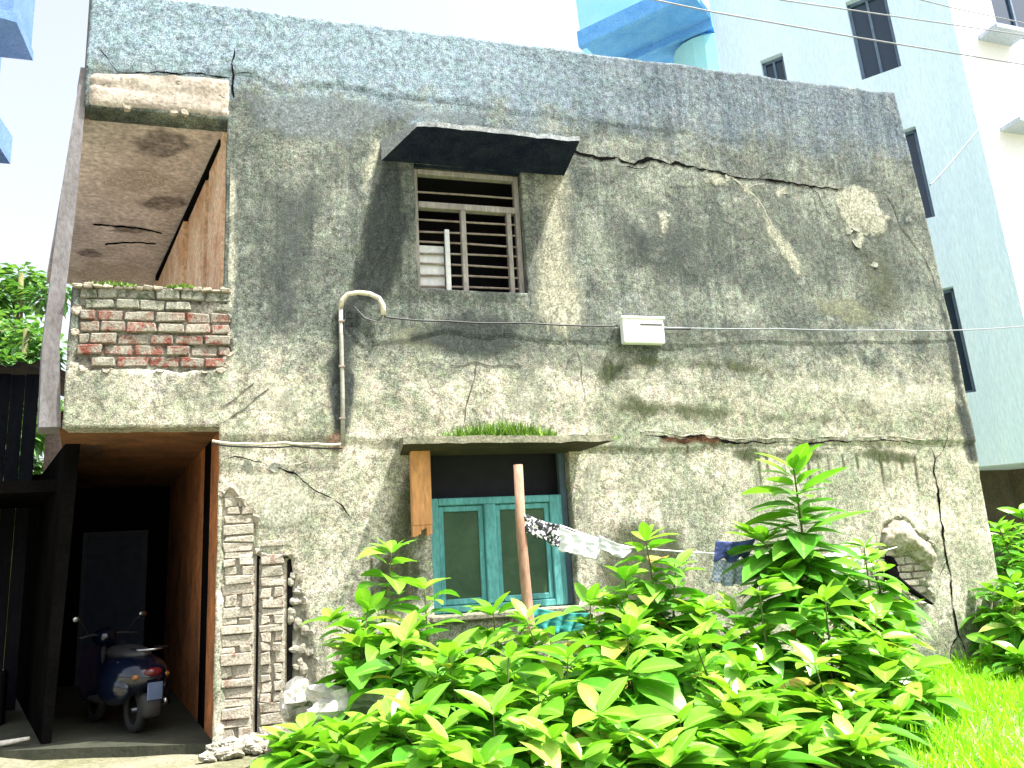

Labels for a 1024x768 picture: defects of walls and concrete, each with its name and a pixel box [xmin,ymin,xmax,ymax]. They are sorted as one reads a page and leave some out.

crack [99,48,253,97]
leakage [137,130,188,157]
crack [93,224,162,245]
crack [575,150,844,244]
flaking render [836,185,889,248]
flaking render [70,262,234,374]
crack [227,456,350,517]
flaking render [218,461,320,739]
crack [641,431,966,659]
flaking render [871,515,937,606]